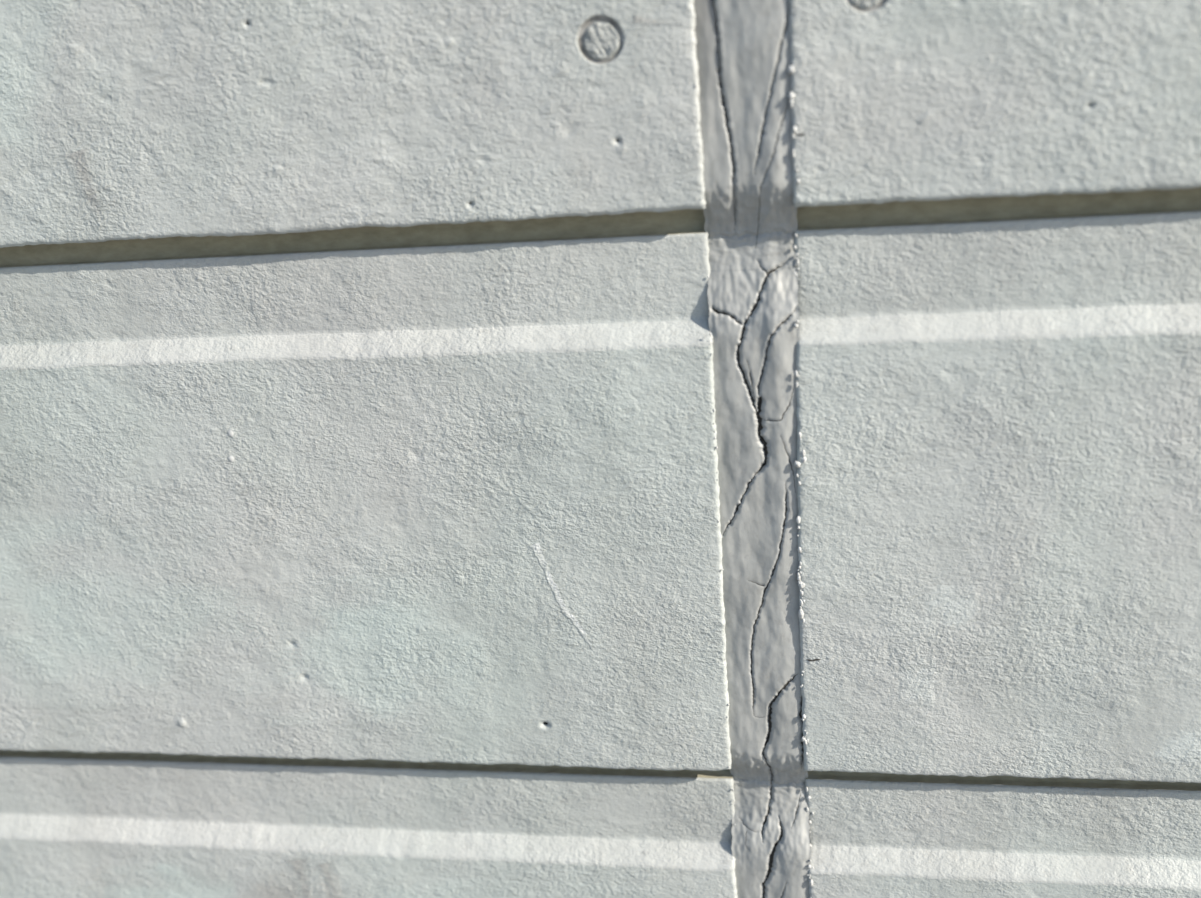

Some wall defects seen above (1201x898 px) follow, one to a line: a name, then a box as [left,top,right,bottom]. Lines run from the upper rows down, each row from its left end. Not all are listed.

crack [712,0,804,898]